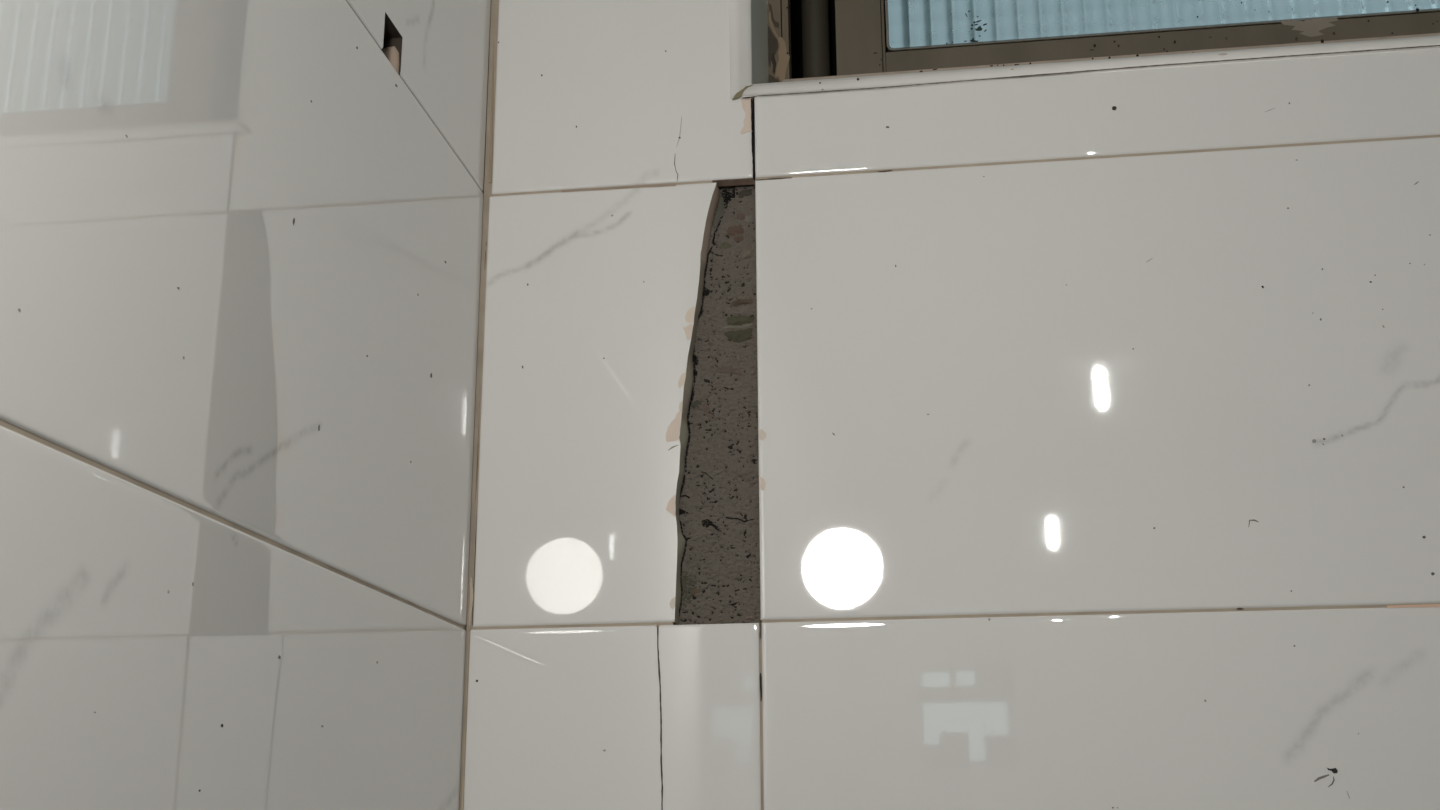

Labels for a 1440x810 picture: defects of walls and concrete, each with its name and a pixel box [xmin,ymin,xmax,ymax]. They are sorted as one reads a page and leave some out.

crack [657,211,754,810]
spalling [655,184,766,627]